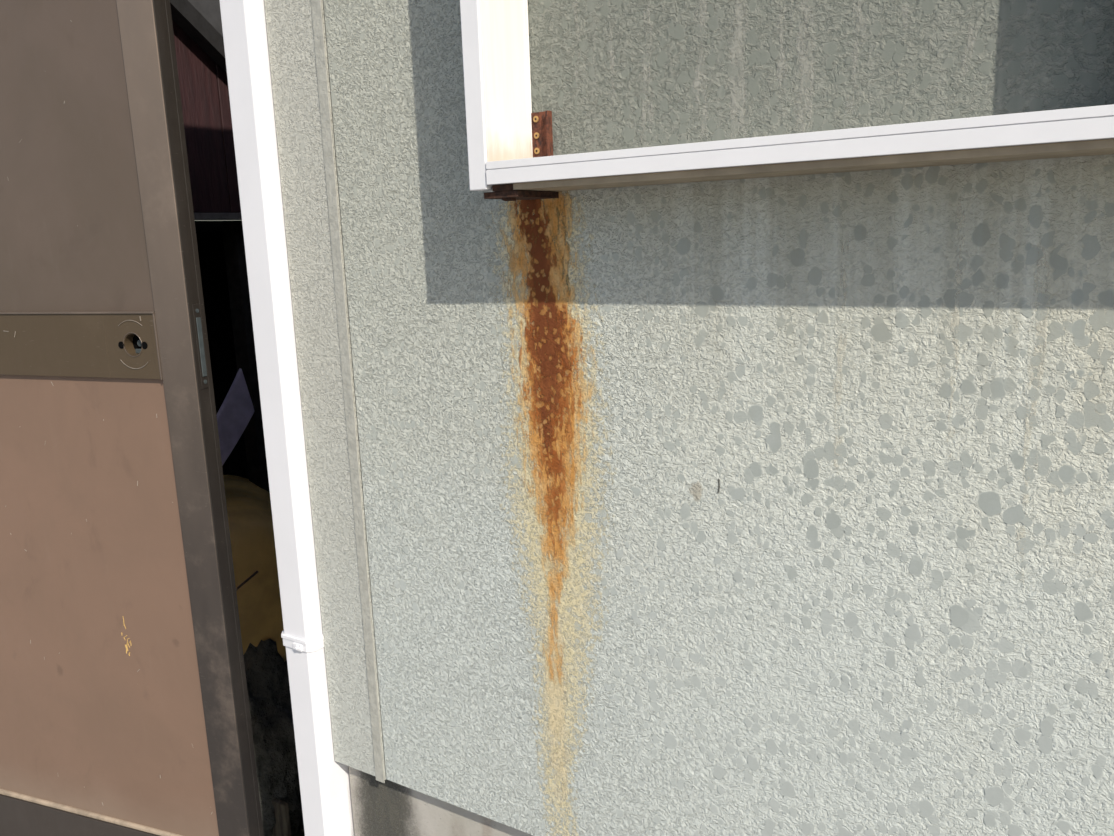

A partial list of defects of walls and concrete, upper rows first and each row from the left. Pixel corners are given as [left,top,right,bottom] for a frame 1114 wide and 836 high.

rust [484,184,616,836]